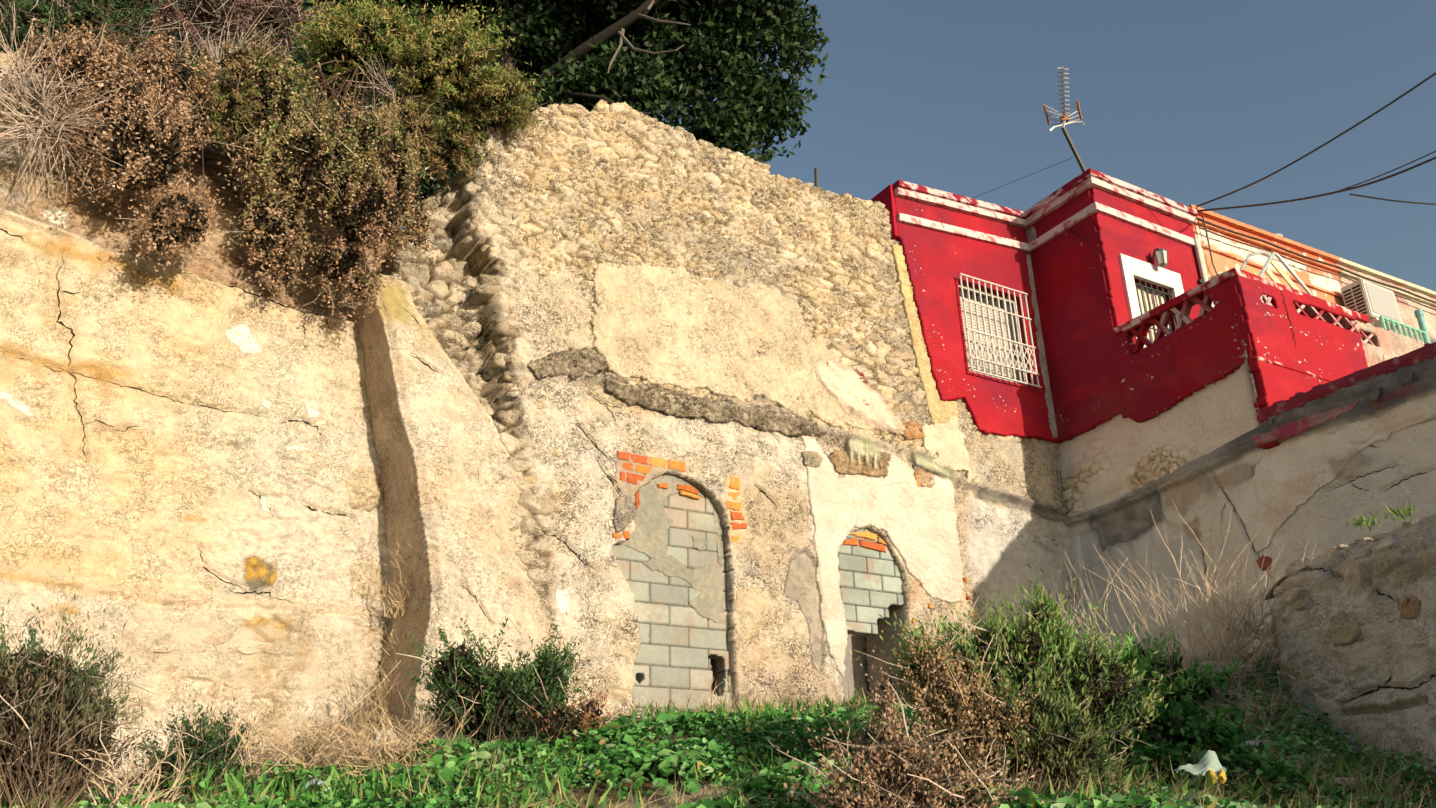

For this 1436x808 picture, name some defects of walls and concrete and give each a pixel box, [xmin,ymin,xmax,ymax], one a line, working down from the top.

crack [1,224,332,463]
flaking render [527,244,1069,677]
crack [1198,475,1272,622]
crack [1308,567,1394,601]